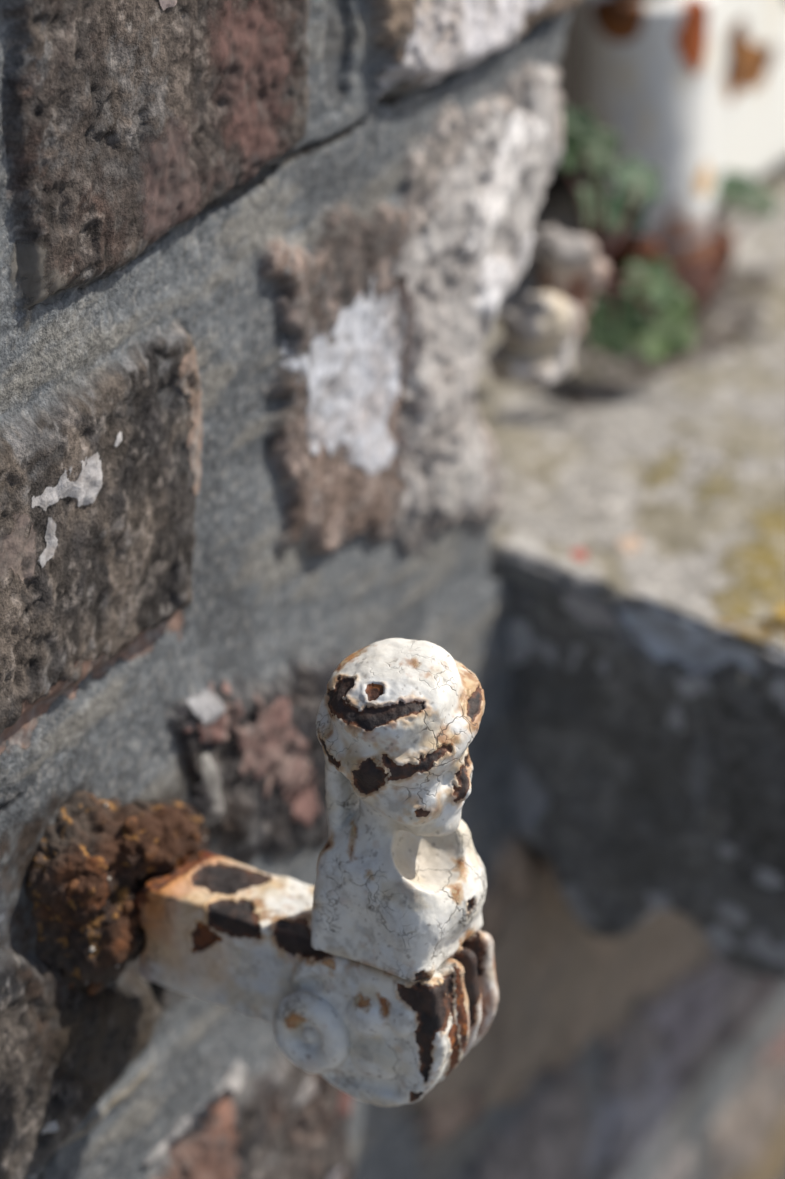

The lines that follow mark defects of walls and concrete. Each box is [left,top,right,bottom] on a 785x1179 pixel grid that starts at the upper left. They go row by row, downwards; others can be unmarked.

corrosion [0,788,181,1113]
corrosion [135,790,245,913]
peeling [190,862,332,960]
spalling [183,677,452,828]
peeling [453,754,470,803]
spalling [511,763,550,837]
peeling [397,932,486,1102]